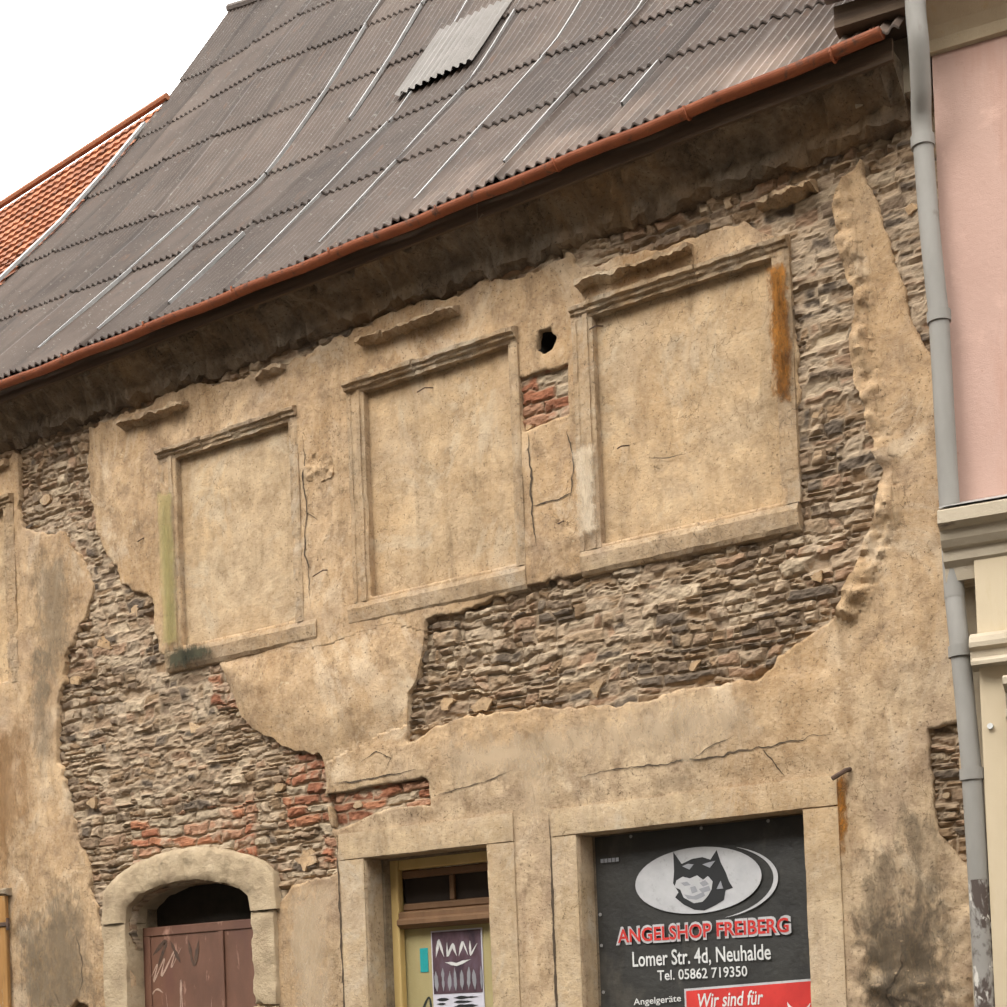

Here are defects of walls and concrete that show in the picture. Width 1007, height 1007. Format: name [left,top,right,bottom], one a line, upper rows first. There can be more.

flaking render [931,95,940,222]
flaking render [201,321,373,386]
flaking render [409,125,930,742]
flaking render [0,401,431,948]
crack [585,734,832,777]